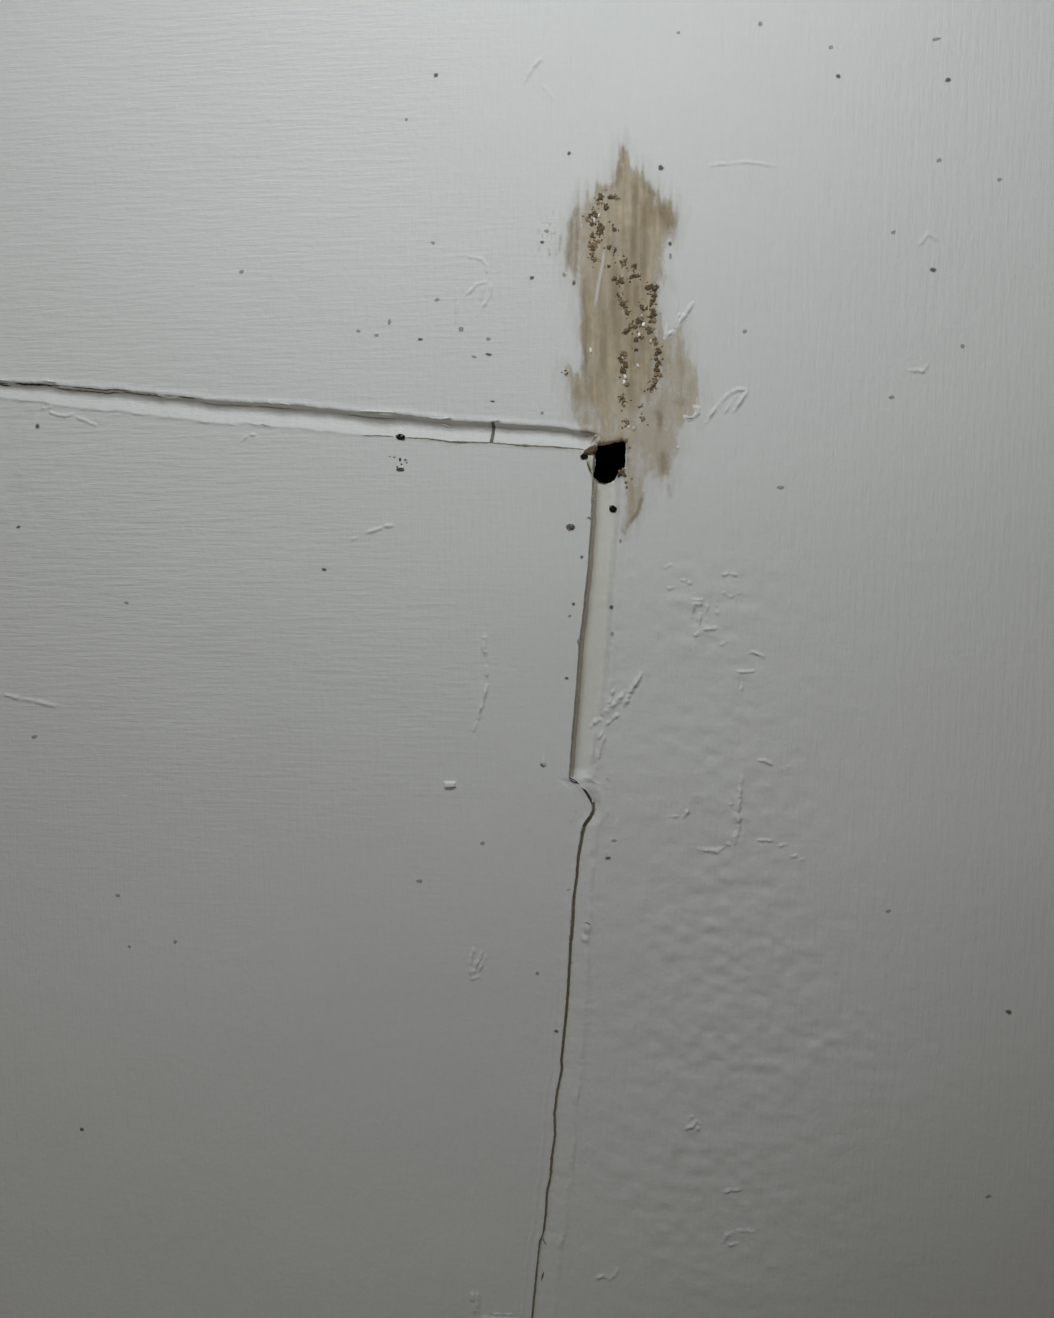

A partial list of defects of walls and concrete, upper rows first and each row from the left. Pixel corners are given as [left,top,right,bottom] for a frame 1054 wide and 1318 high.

spalling [586,438,626,483]
water stain [561,152,702,521]
crack [0,367,639,1318]